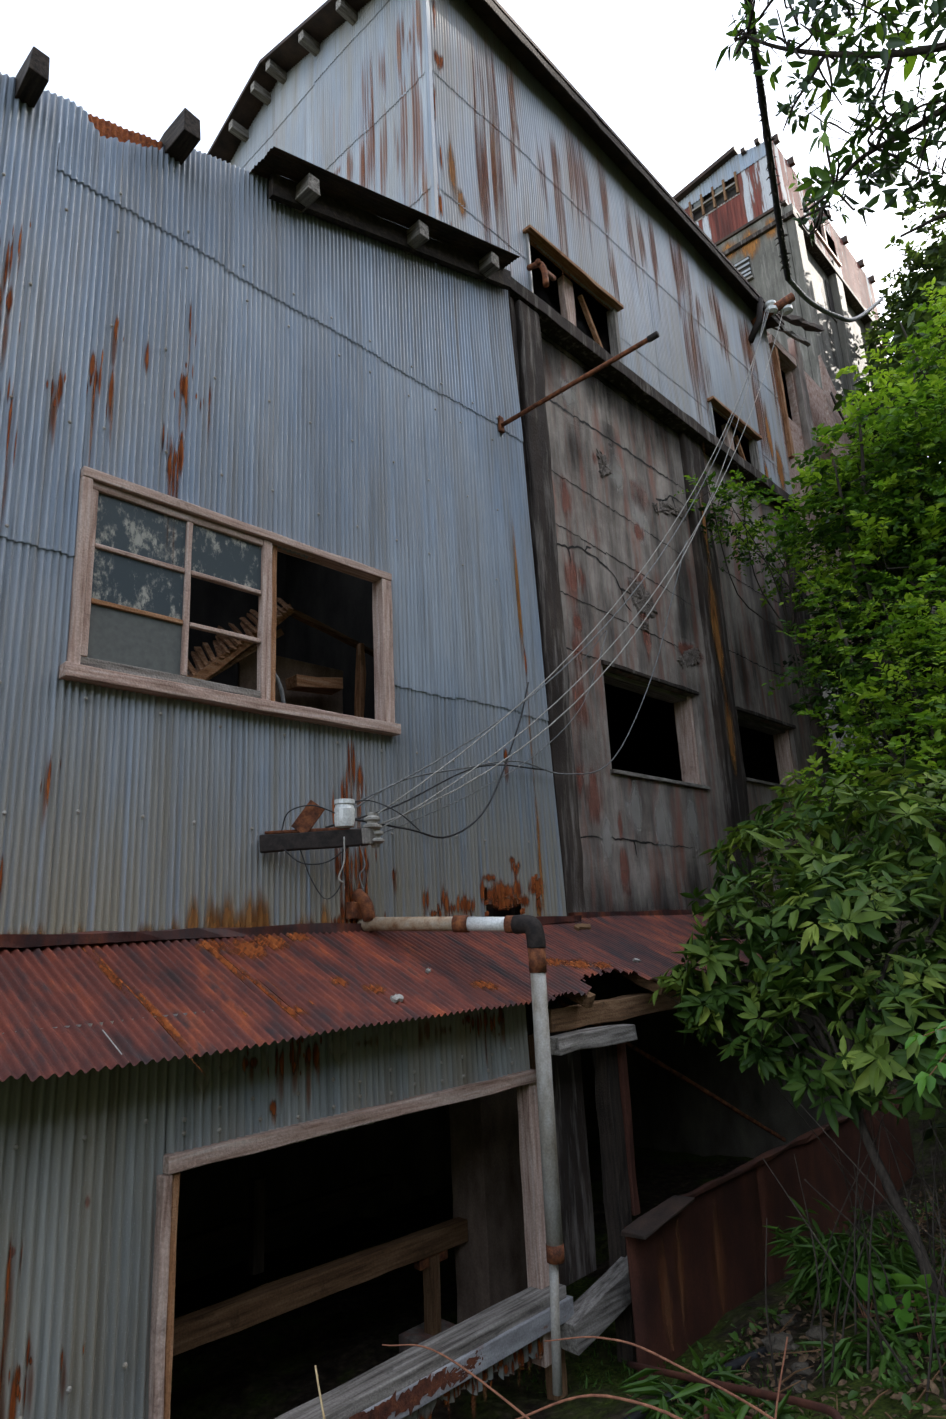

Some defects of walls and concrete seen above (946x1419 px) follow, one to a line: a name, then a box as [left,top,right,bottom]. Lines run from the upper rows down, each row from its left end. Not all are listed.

corrosion [337,0,520,251]
corrosion [0,222,31,351]
corrosion [6,379,17,459]
corrosion [46,373,66,435]
corrosion [87,318,124,451]
corrosion [162,304,211,498]
water stain [561,358,666,442]
corrosion [332,733,363,826]
water stain [603,788,671,911]
corrosion [79,929,202,1071]
corrosion [172,846,384,1121]
corrosion [0,1242,32,1419]